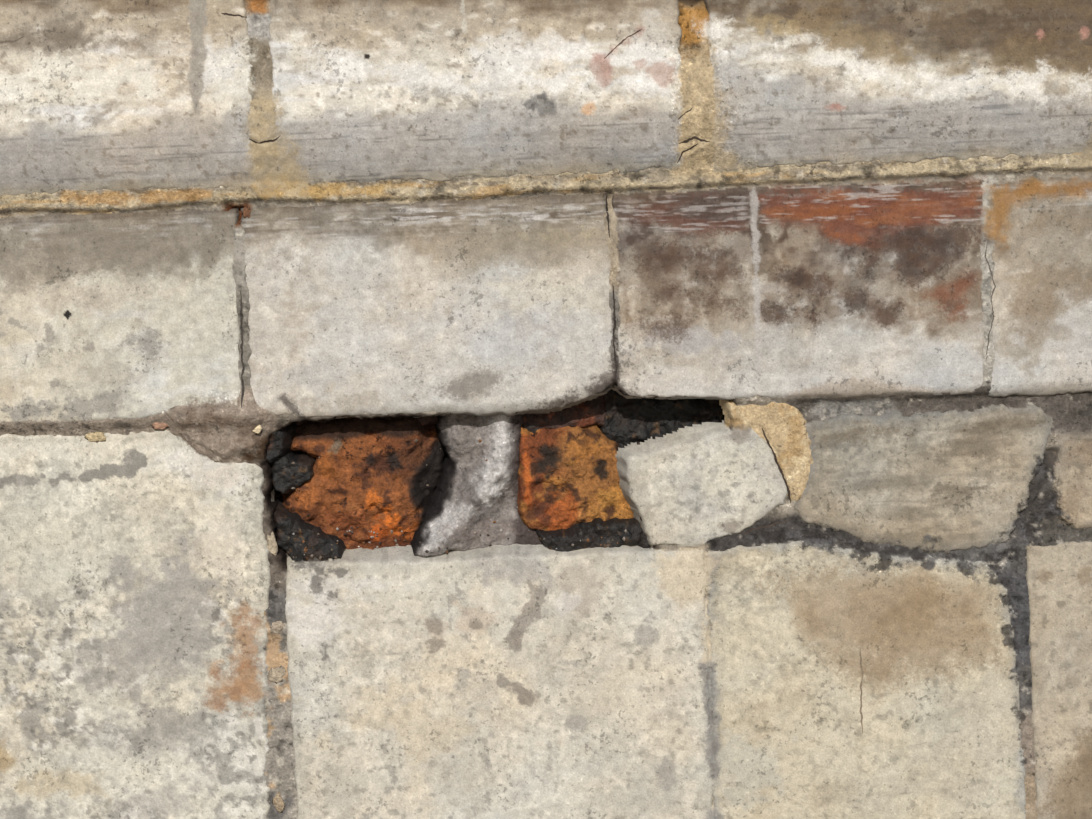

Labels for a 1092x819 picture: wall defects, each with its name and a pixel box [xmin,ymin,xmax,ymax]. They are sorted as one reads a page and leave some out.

water stain [688,0,1092,113]
water stain [314,178,1092,356]
water stain [750,262,765,374]
corrosion [616,167,1092,259]
corrosion [916,261,985,331]
crack [985,243,996,359]
spalling [280,417,446,550]
spalling [516,420,788,545]
corrosion [198,596,280,722]
water stain [741,553,1026,714]